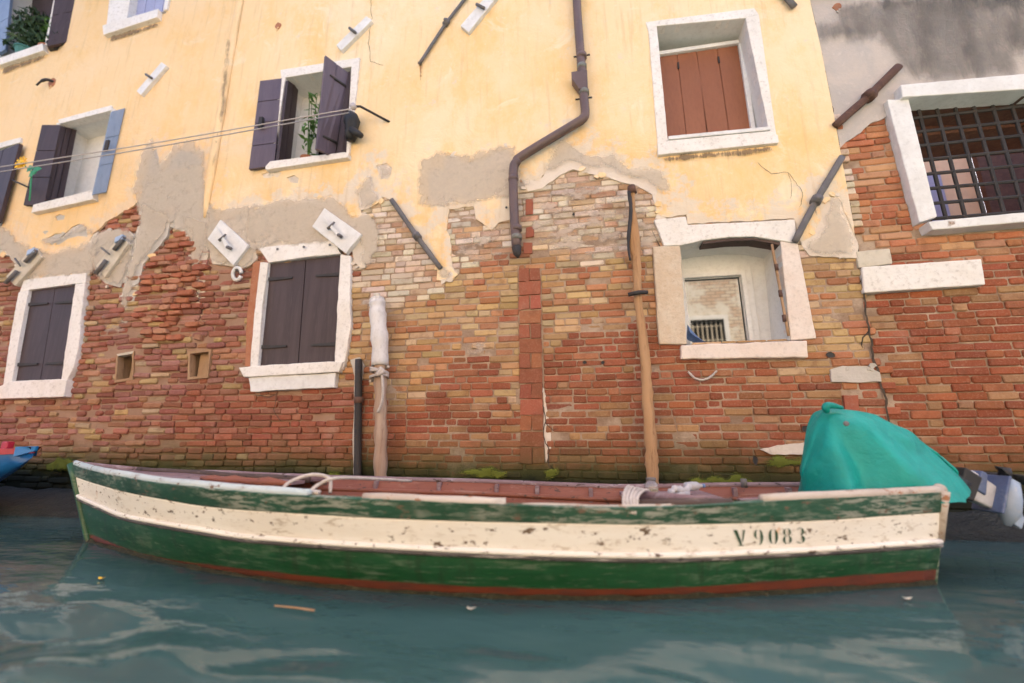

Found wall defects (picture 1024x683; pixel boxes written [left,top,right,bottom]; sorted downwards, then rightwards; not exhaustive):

peeling [419,141,668,220]
peeling [0,142,397,306]
peeling [800,192,858,259]
peeling [434,264,458,284]
crack [542,405,557,469]